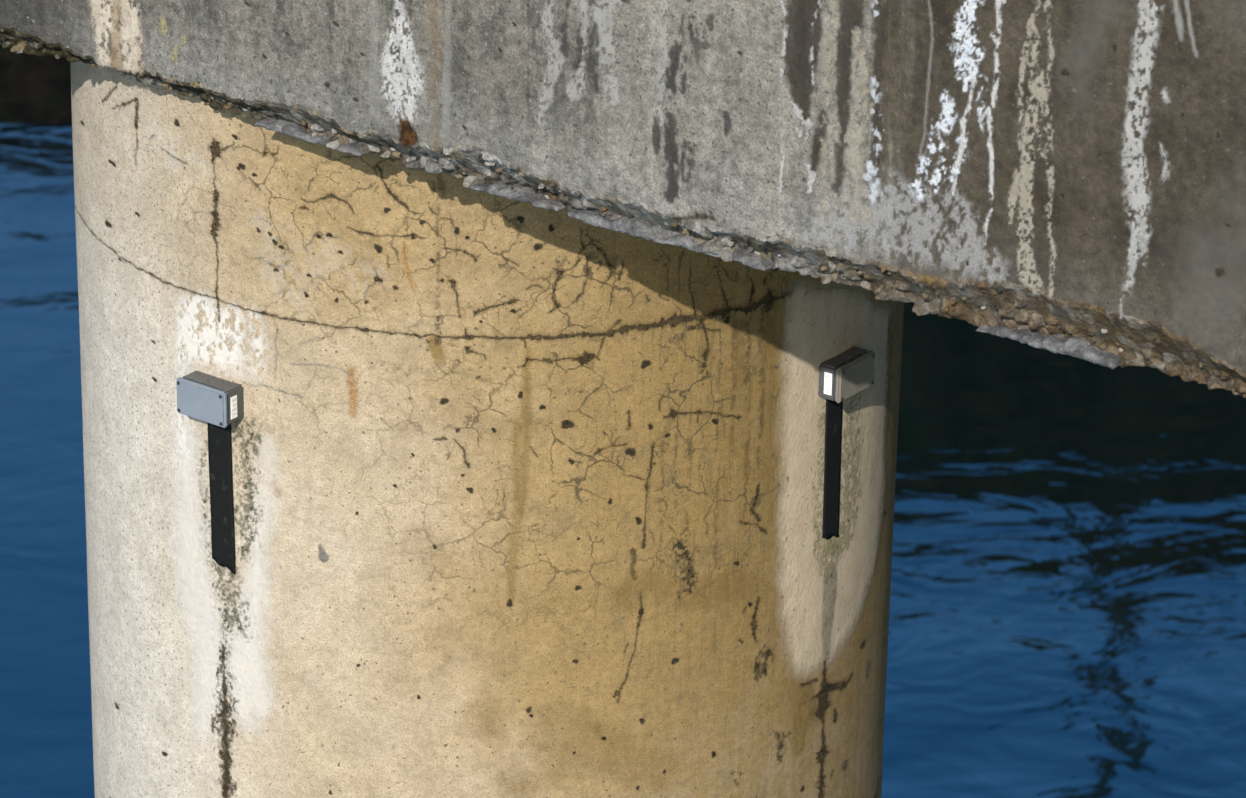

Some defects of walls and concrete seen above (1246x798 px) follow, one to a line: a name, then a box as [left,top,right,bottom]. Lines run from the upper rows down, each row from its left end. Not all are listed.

leakage [91,0,144,74]
leakage [370,0,422,122]
corrosion [397,118,417,147]
crack [73,86,808,378]
spalling [0,26,1246,398]
leakage [781,0,1056,298]
leakage [1119,0,1170,317]
leakage [1173,0,1195,51]
crack [433,436,470,468]
crack [573,398,742,549]
crack [212,644,234,798]
crack [800,659,870,798]